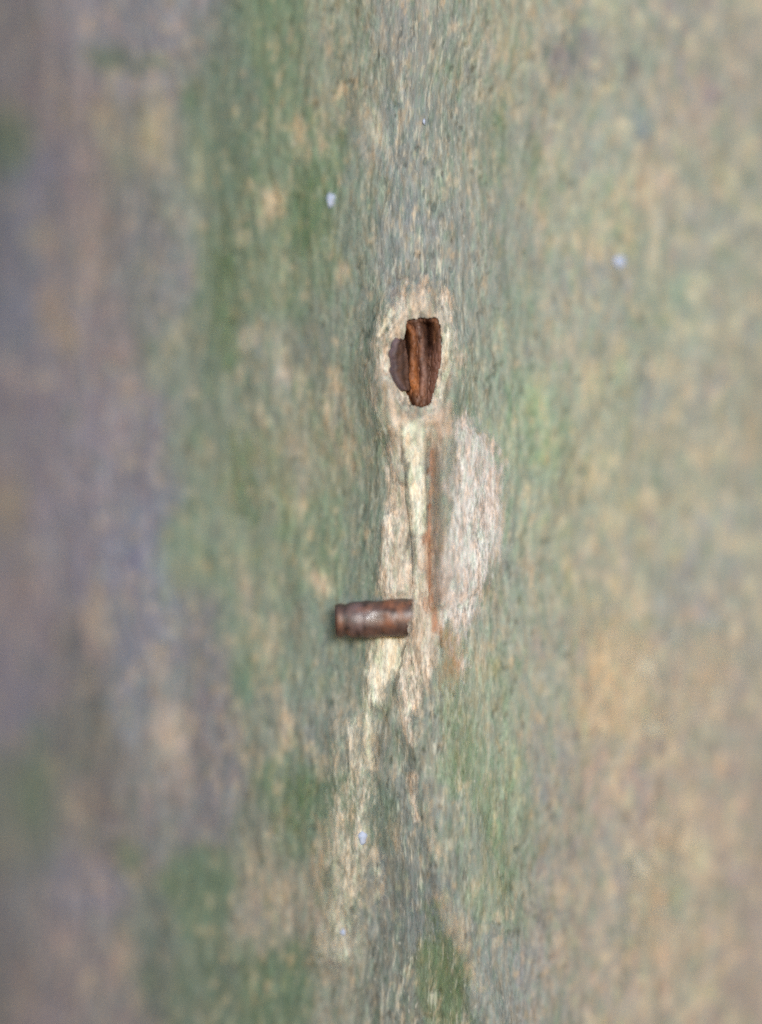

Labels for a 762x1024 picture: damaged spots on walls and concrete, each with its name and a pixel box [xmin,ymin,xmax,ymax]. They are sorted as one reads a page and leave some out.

peeling [322,275,504,960]
rust [424,451,437,631]